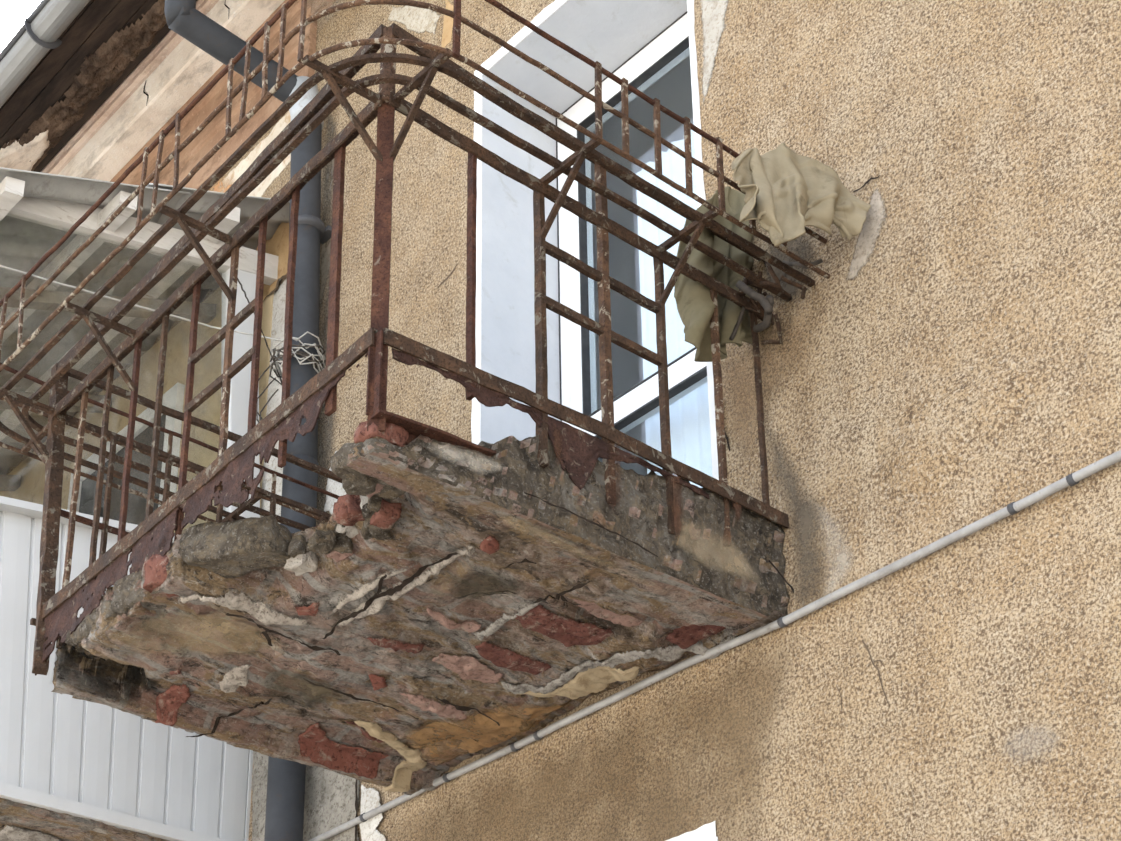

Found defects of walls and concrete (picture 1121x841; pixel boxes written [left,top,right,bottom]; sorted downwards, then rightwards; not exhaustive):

peeling [388,0,453,48]
spalling [0,0,167,171]
peeling [256,222,289,416]
spalling [65,421,499,647]
damp [776,451,819,598]
crack [225,552,458,655]
spalling [367,599,736,700]
crack [534,581,591,605]
crack [303,678,500,726]
spalling [0,825,60,841]
spalling [251,751,268,841]
spalling [298,720,427,841]